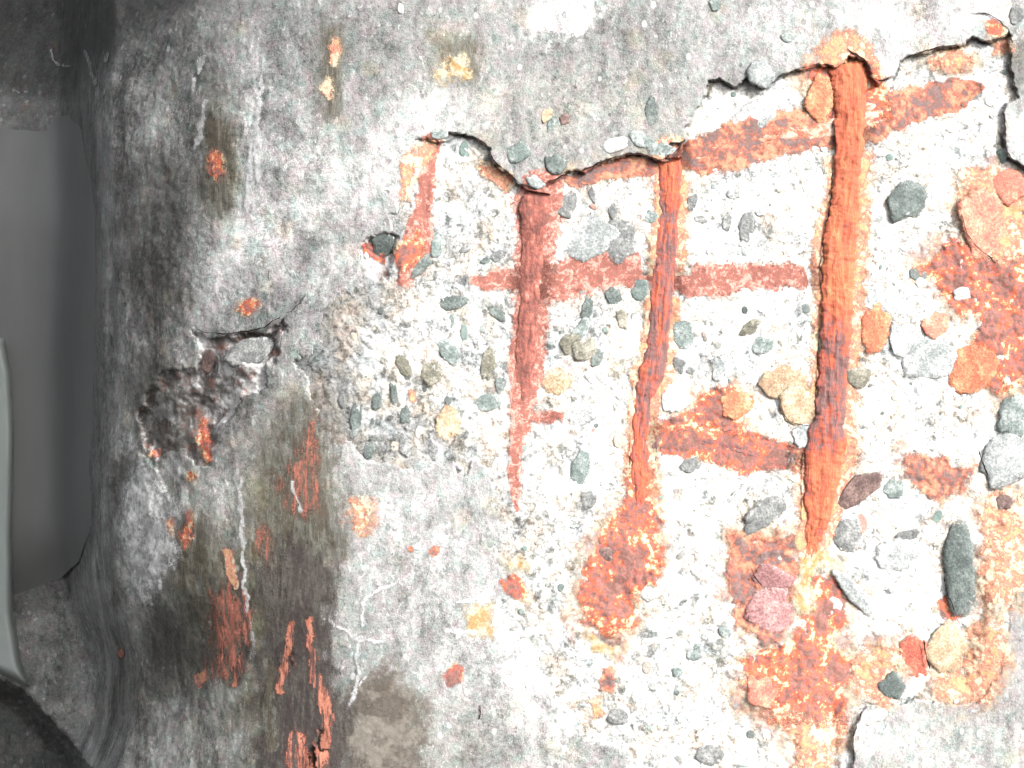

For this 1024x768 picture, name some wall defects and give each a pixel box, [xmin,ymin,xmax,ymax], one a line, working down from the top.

rust [792,55,842,97]
rust [863,61,894,128]
spalling [114,319,287,607]
crack [197,289,334,349]
rust [194,410,366,768]
rust [524,409,566,426]
rust [563,465,669,718]
spalling [293,27,1024,768]
rust [667,379,760,442]
rust [713,523,914,768]
rust [892,439,1024,706]
rust [899,157,1024,406]